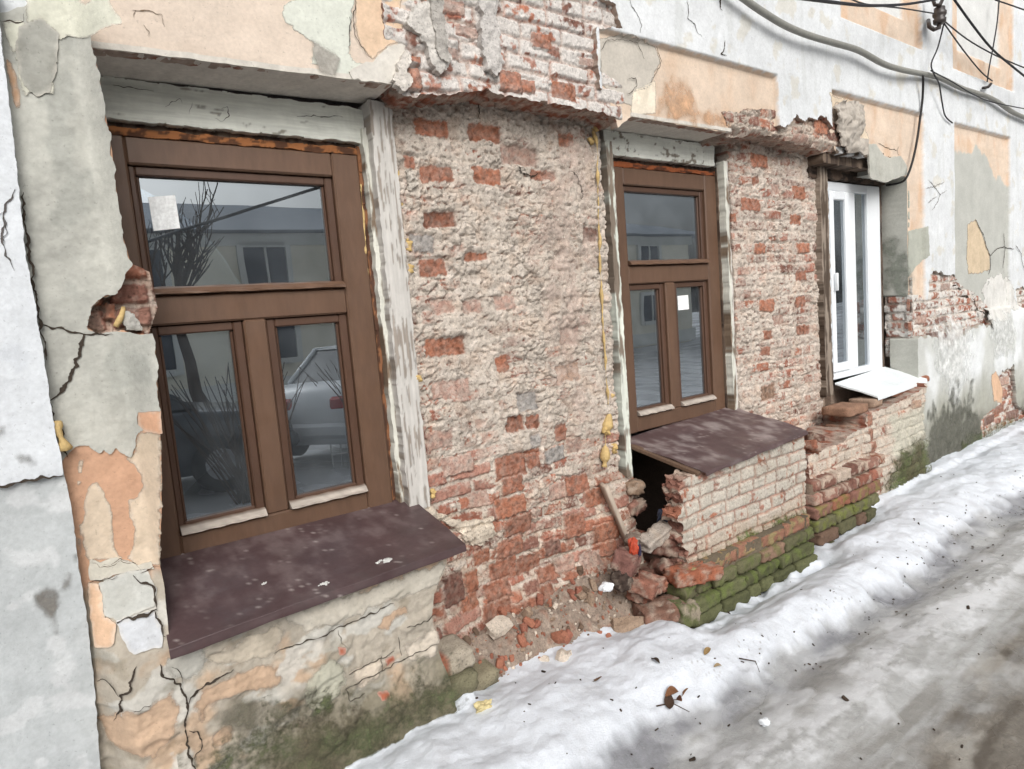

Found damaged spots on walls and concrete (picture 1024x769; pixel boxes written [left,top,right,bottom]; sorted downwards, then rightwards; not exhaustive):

peeling [4,0,122,107]
crack [0,190,109,488]
spalling [87,265,158,335]
spalling [166,0,660,721]
spalling [698,92,850,430]
spalling [884,219,1024,357]
damp [928,314,980,463]
crack [976,220,1024,270]
peeling [78,411,163,565]
crack [98,664,234,769]
crack [276,603,393,653]
crack [346,615,438,702]